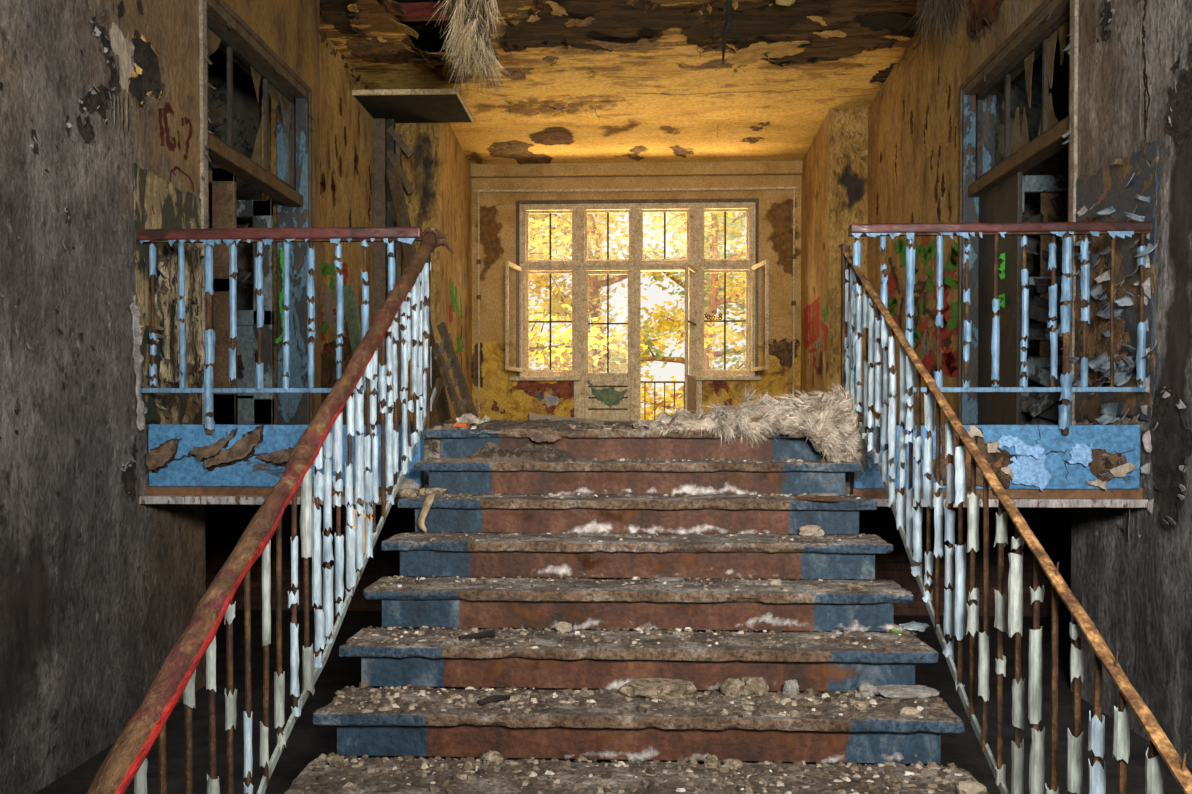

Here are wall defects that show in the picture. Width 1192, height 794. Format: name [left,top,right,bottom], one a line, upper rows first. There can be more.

peeling [965,0,1004,44]
peeling [486,131,574,165]
peeling [614,146,649,161]
peeling [669,145,694,158]
peeling [741,121,770,144]
peeling [902,64,957,223]